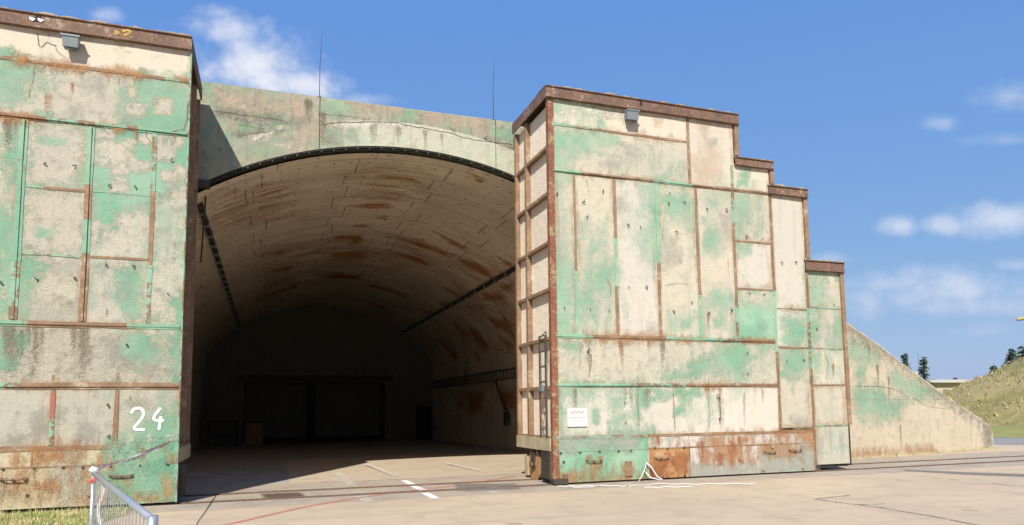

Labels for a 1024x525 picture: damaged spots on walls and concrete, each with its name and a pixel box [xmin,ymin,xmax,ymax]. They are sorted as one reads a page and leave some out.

rust [8,50,151,95]
crack [323,113,512,145]
peeling [0,44,190,508]
rust [393,232,516,354]
peeling [550,98,909,456]
rust [0,434,177,508]
rust [560,423,822,483]